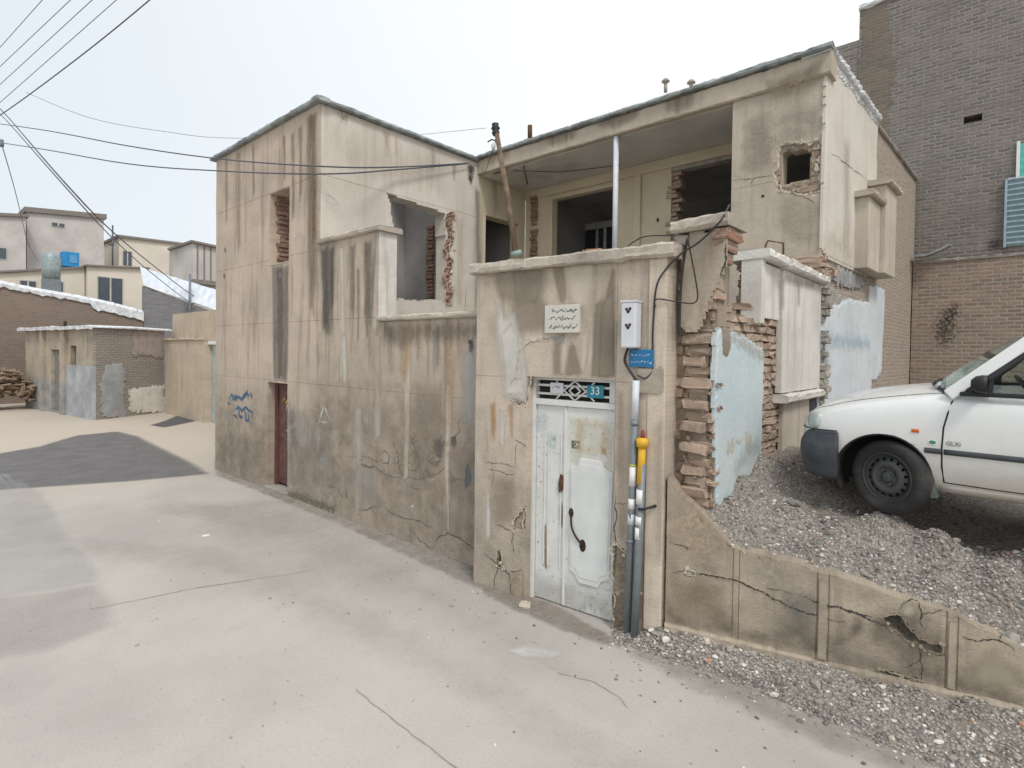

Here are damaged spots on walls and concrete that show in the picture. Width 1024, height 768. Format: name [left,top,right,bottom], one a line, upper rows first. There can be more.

spalling [770,137,826,198]
damp [274,267,288,379]
flaking render [275,197,290,263]
damp [292,175,371,383]
spalling [442,210,460,309]
crack [356,464,521,593]
crack [670,541,941,679]
hole [882,613,946,656]
crack [964,632,1013,648]